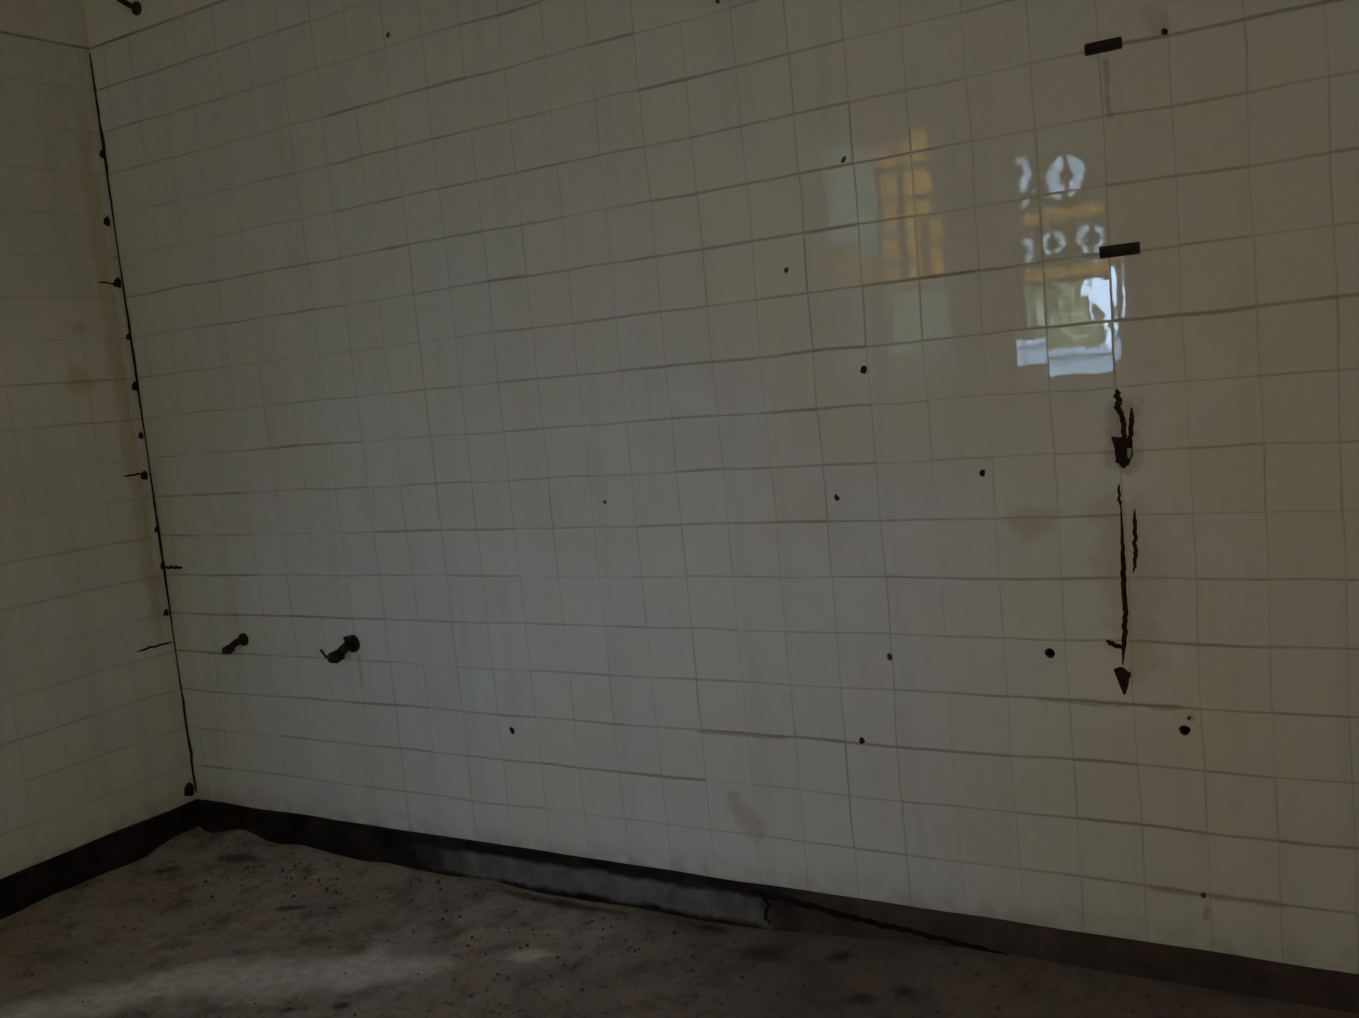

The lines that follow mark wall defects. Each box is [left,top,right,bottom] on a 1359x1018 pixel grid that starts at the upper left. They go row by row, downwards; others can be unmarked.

corrosion [983,478,1197,724]